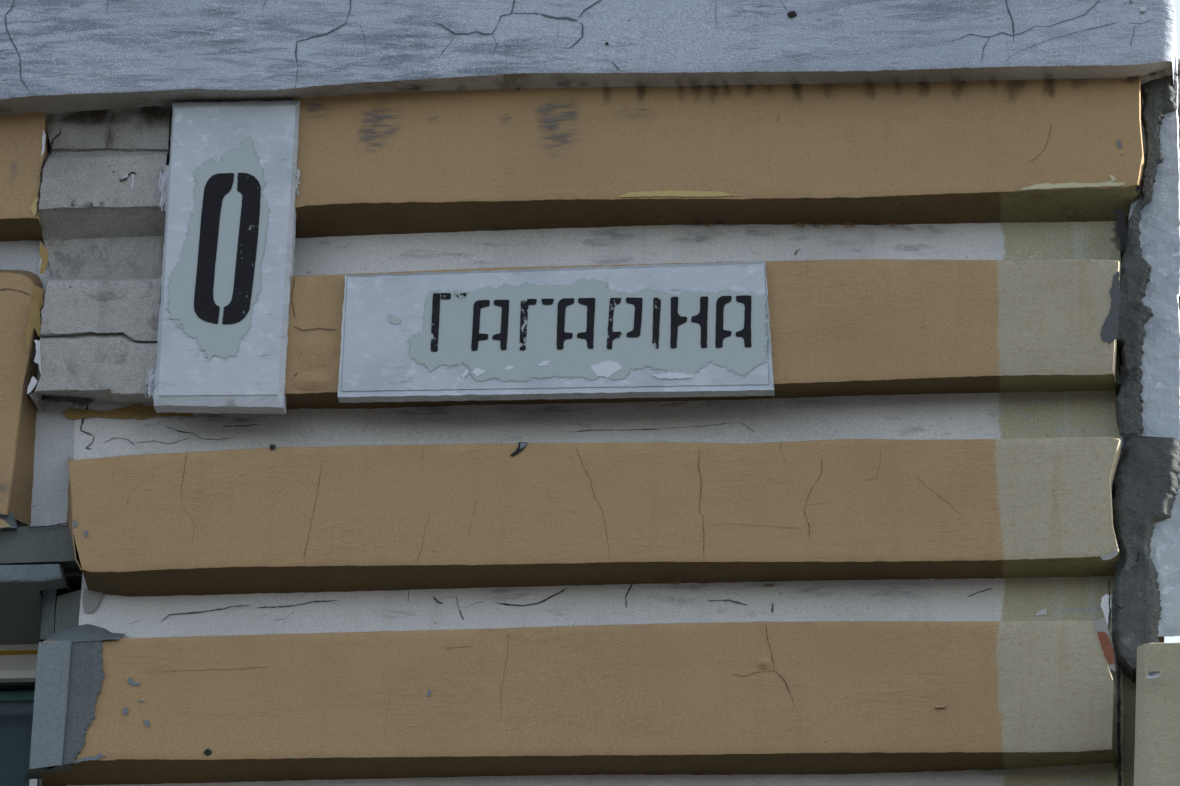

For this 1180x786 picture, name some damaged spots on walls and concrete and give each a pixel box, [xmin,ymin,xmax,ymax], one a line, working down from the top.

crack [0,0,31,92]
crack [295,0,367,89]
crack [437,0,601,56]
crack [951,0,1153,61]
crack [37,129,61,214]
crack [23,345,258,488]
crack [577,428,663,534]
crack [697,462,705,554]
spalling [1100,547,1118,560]
crack [709,599,794,703]
spalling [1092,594,1115,671]